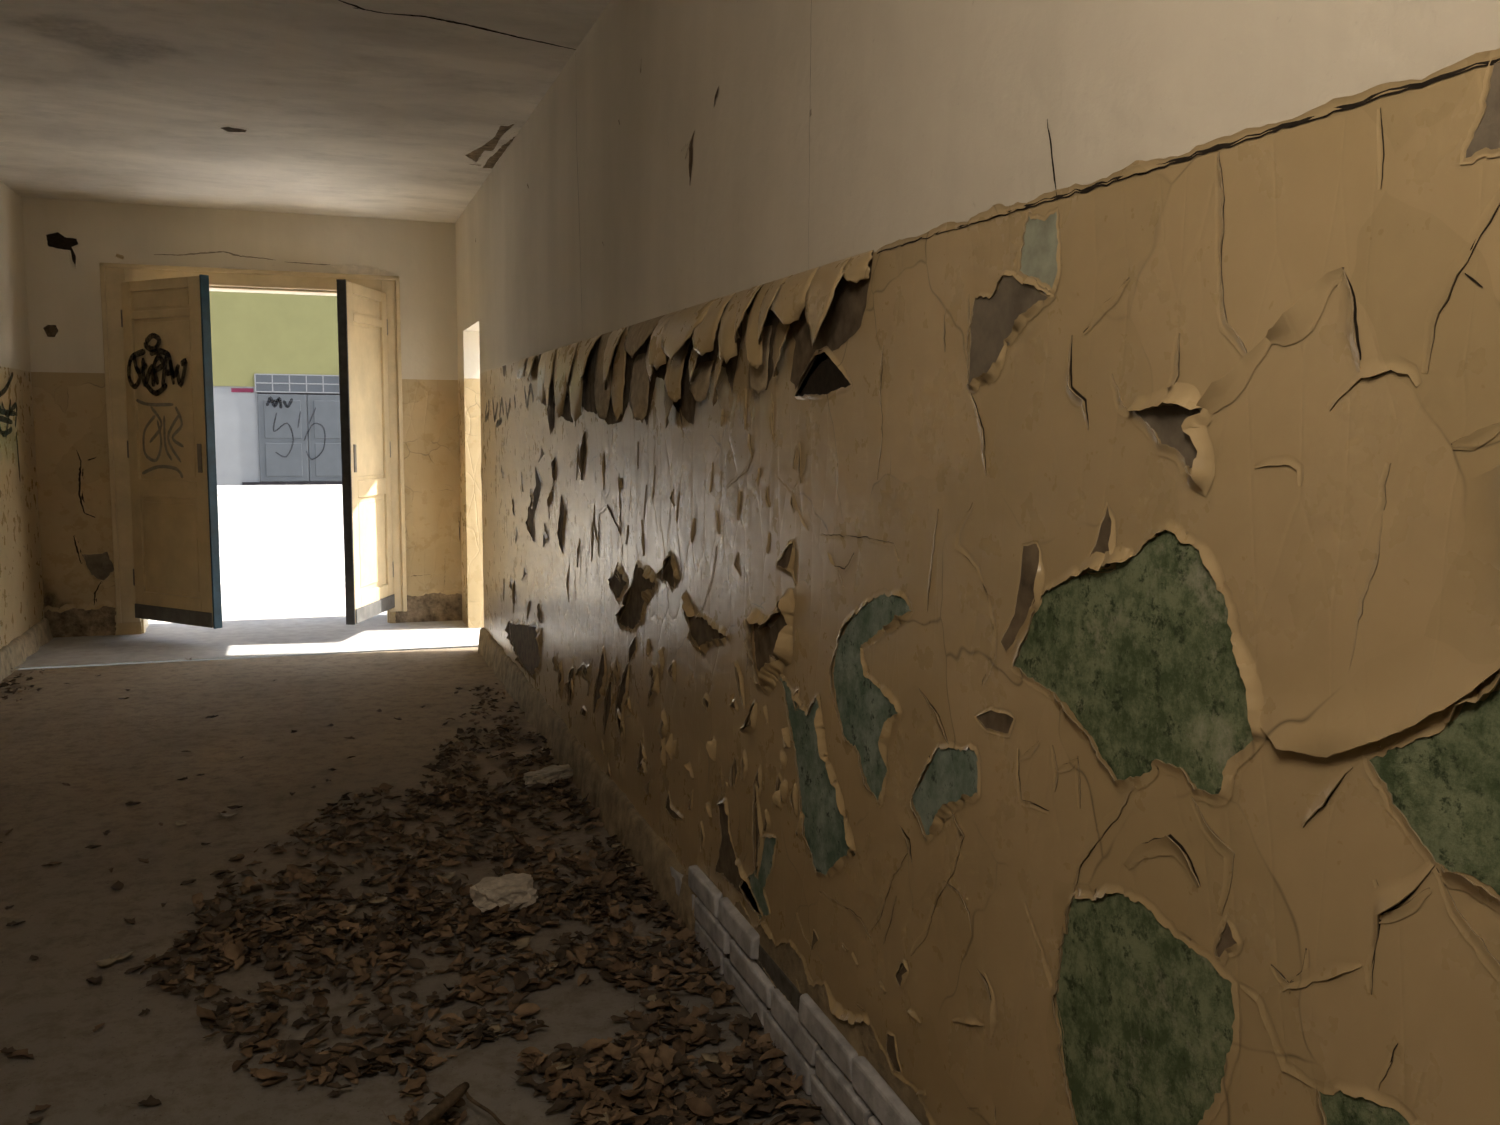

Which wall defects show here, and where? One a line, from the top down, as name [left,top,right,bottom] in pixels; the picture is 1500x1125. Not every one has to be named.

crack [338,0,576,50]
crack [877,48,1500,414]
peeling [501,250,873,602]
crack [941,294,986,476]
crack [1064,335,1134,431]
peeling [1127,382,1215,497]
crack [1451,423,1500,451]
peeling [999,502,1267,807]
crack [1348,463,1390,673]
peeling [503,441,938,1125]
peeling [1361,669,1500,914]
peeling [1050,882,1245,1125]